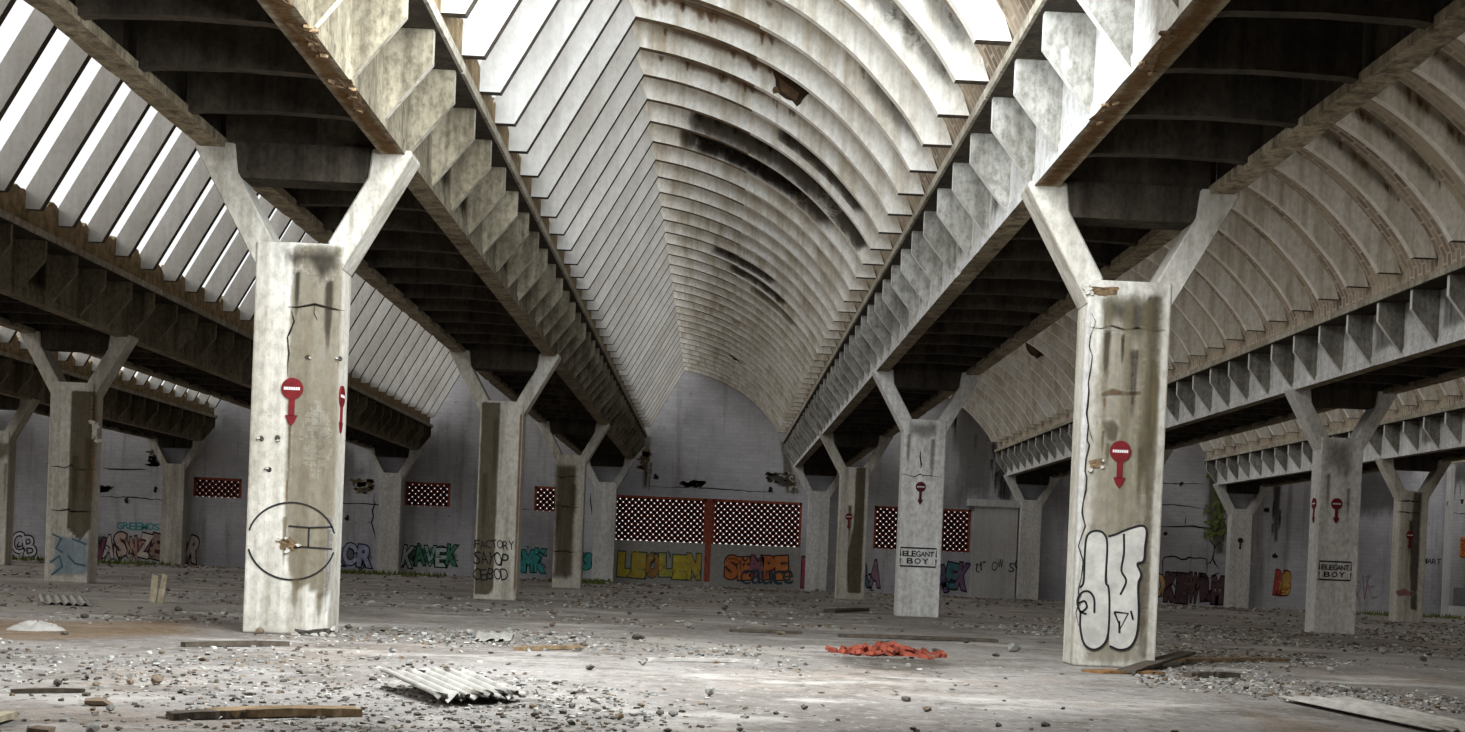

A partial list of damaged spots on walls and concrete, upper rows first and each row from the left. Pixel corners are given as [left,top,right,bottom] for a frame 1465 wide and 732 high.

spalling [771,68,809,106]
leakage [681,112,866,249]
leakage [715,247,794,322]
leakage [283,246,342,611]